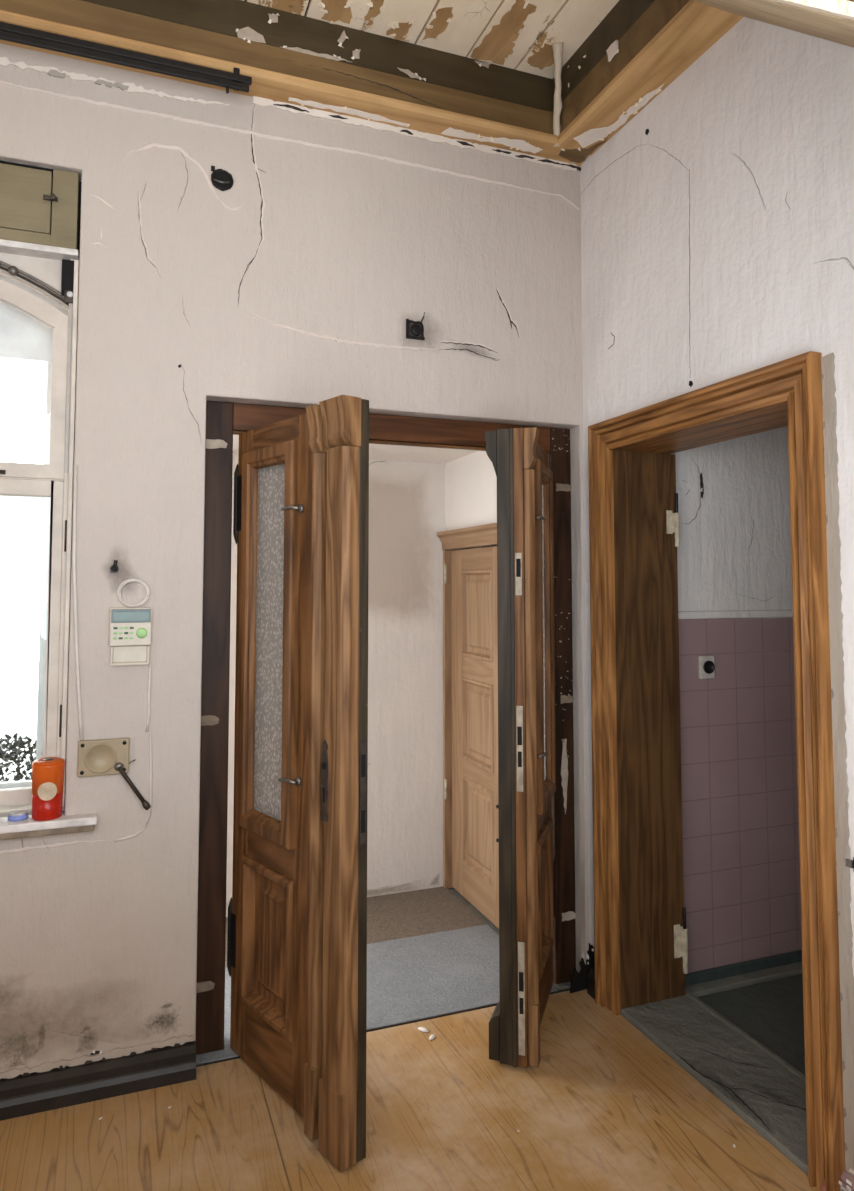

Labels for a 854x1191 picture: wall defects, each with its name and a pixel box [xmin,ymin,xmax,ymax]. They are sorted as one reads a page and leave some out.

peeling [236,0,453,62]
peeling [397,67,426,81]
peeling [470,0,536,68]
peeling [526,39,554,70]
peeling [606,40,619,62]
peeling [253,84,664,171]
crack [238,105,266,305]
crack [731,153,791,210]
crack [815,257,854,272]
crack [439,288,520,361]